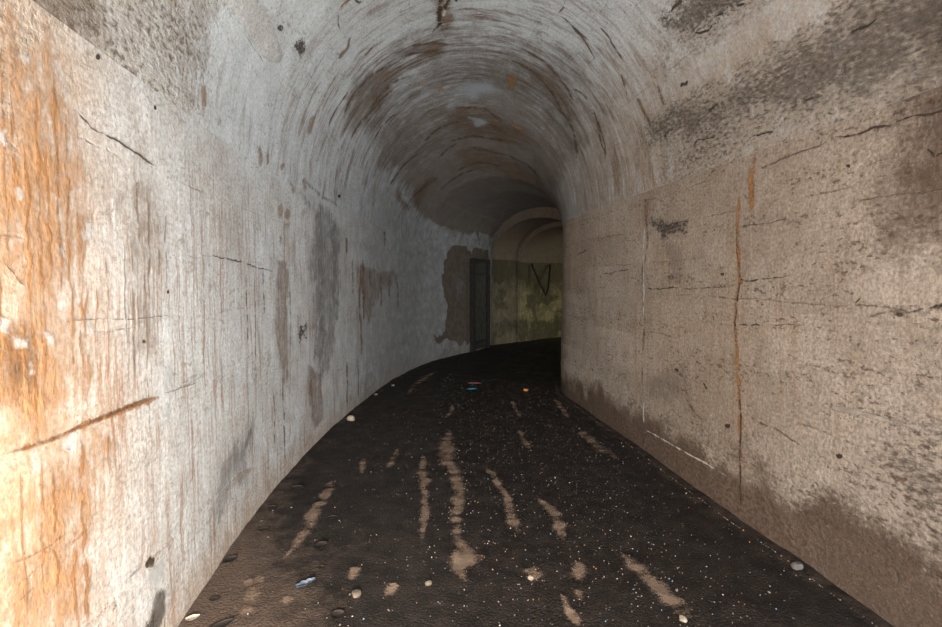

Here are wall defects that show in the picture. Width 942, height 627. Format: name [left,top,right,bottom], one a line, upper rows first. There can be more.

crack [434,0,458,30]
corrosion [0,13,110,451]
crack [13,383,195,452]
crack [80,113,152,165]
damp [246,185,399,455]
peeling [434,245,489,346]
crack [605,199,794,501]
corrosion [1,432,111,627]